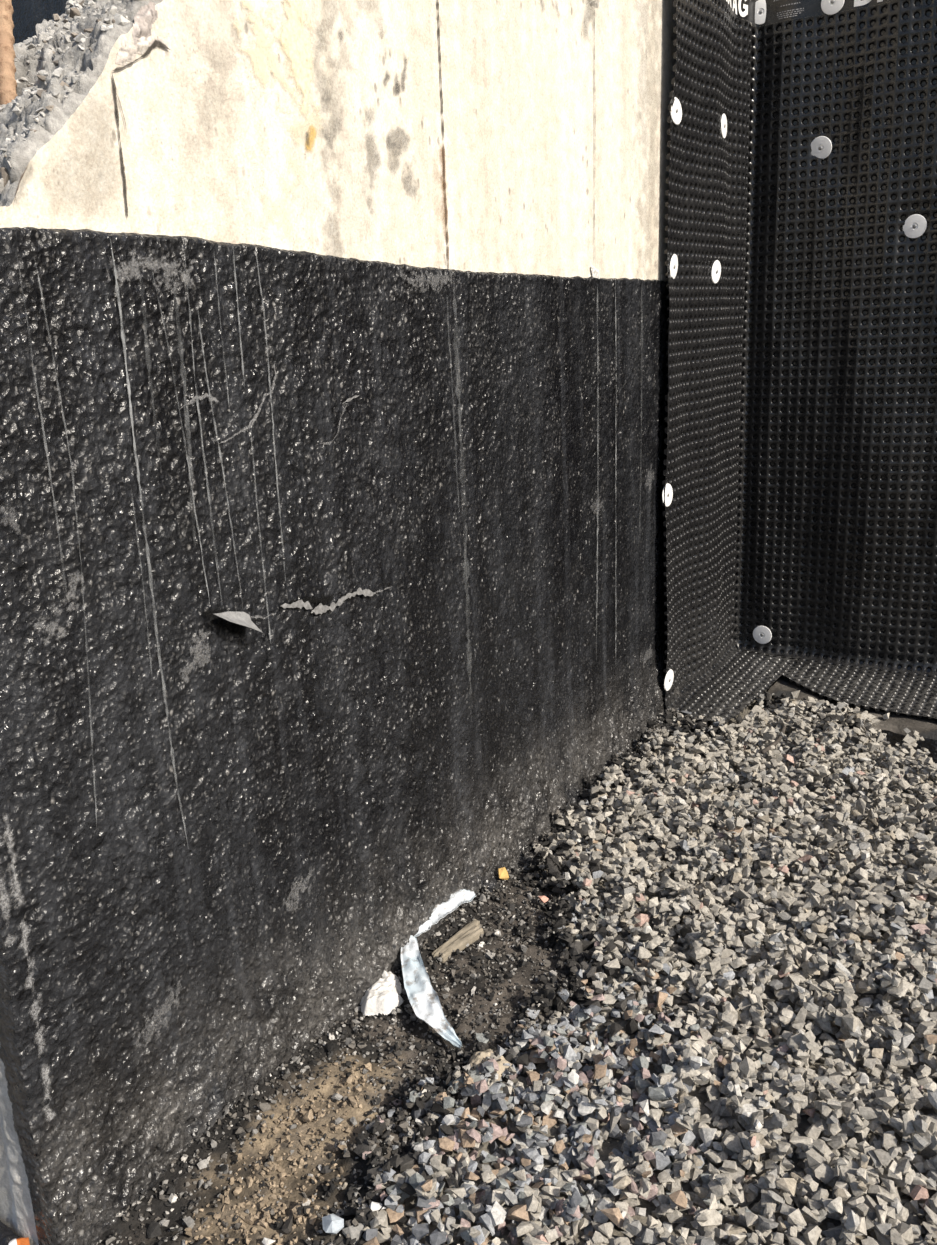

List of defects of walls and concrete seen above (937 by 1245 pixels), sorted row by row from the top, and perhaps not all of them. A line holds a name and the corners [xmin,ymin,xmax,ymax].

spalling [0,0,17,105]
spalling [115,1,168,66]
peeling [108,252,193,292]
crack [251,587,389,619]